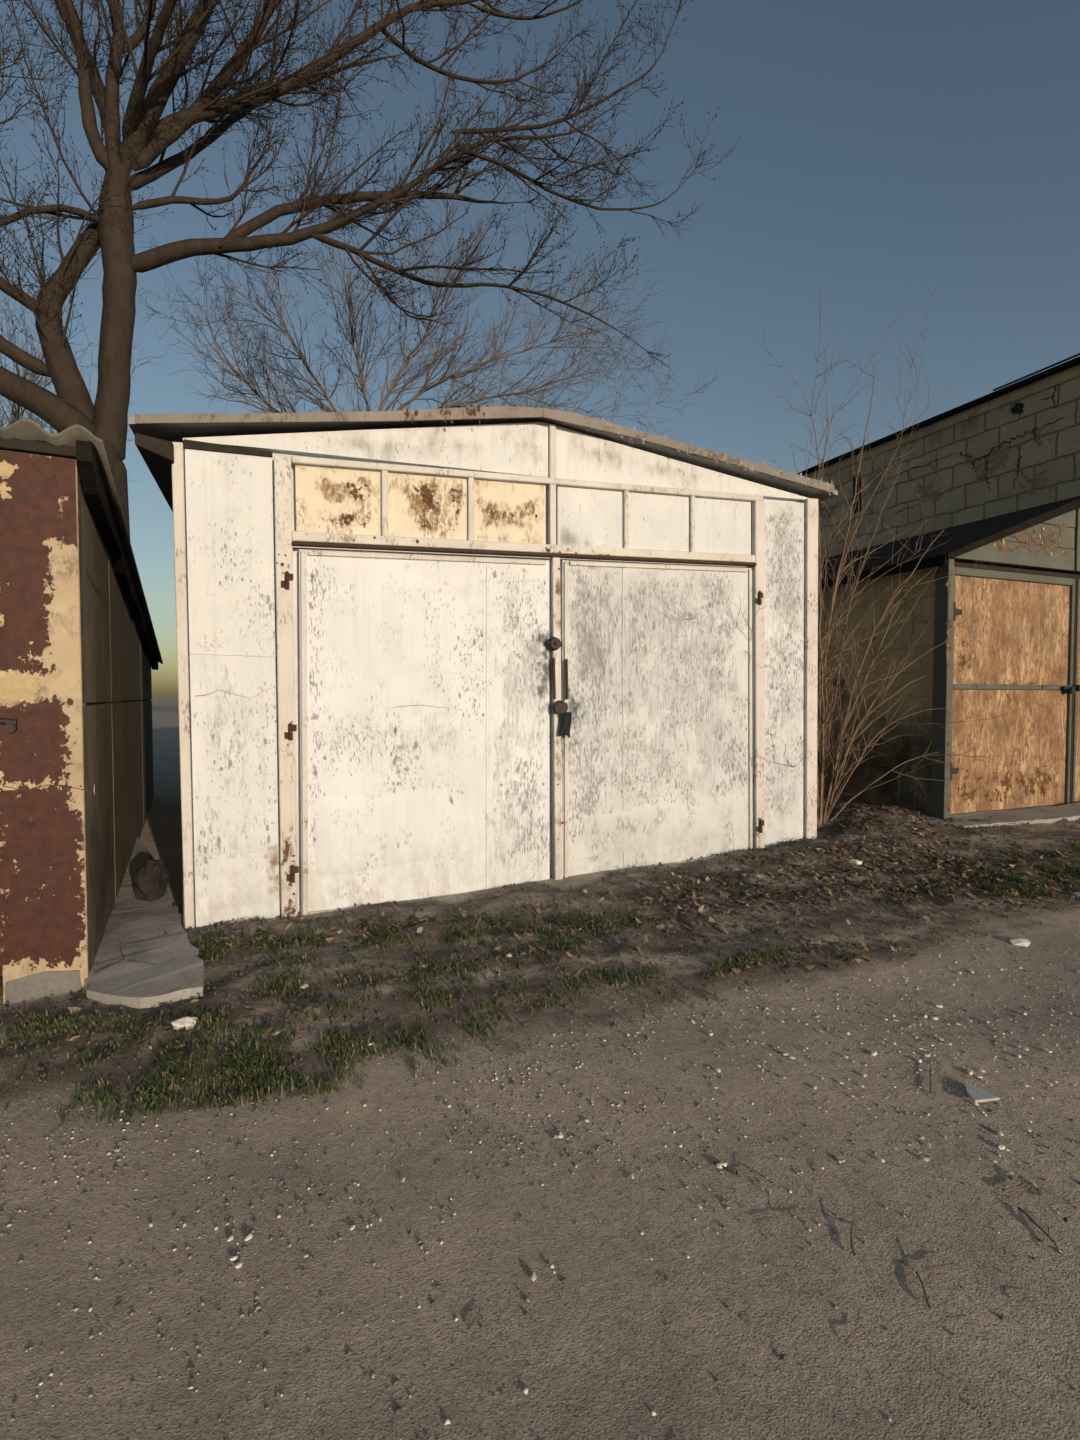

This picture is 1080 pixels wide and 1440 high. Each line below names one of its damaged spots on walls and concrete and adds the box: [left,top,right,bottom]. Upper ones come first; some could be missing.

rust [306,478,376,542]
rust [404,484,462,544]
rust [478,502,538,526]